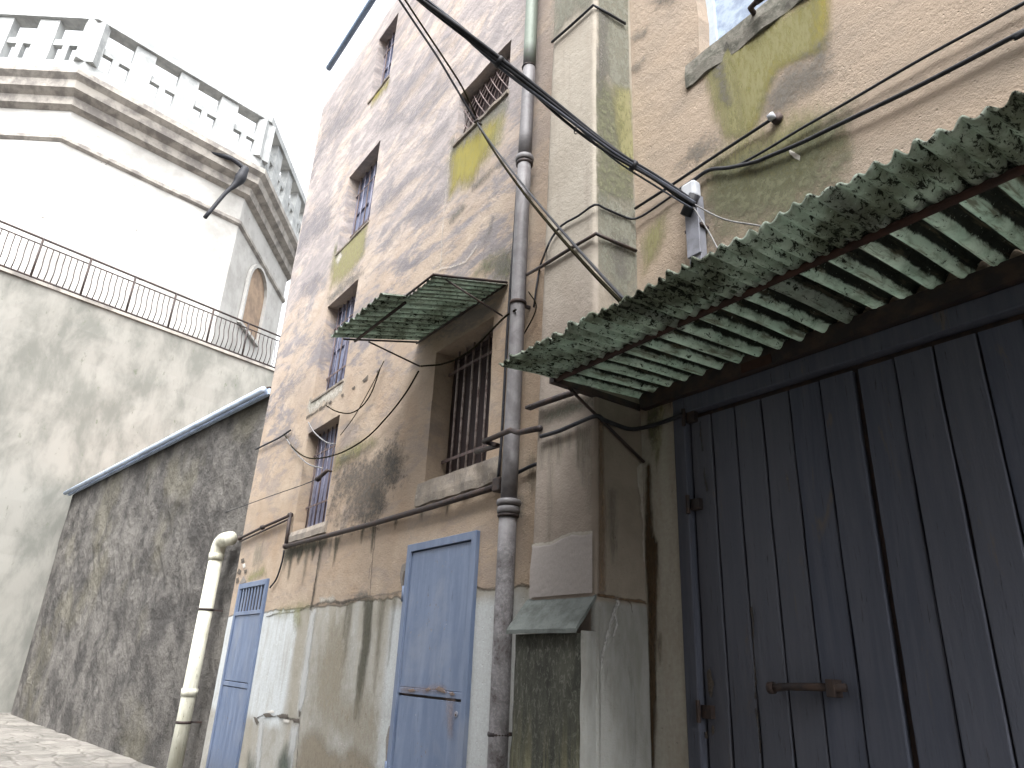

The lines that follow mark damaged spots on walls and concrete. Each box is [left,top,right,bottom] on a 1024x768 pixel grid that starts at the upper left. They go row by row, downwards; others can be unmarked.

damp [681,42,851,245]
damp [284,434,401,575]
damp [311,598,385,738]
crack [598,594,647,664]